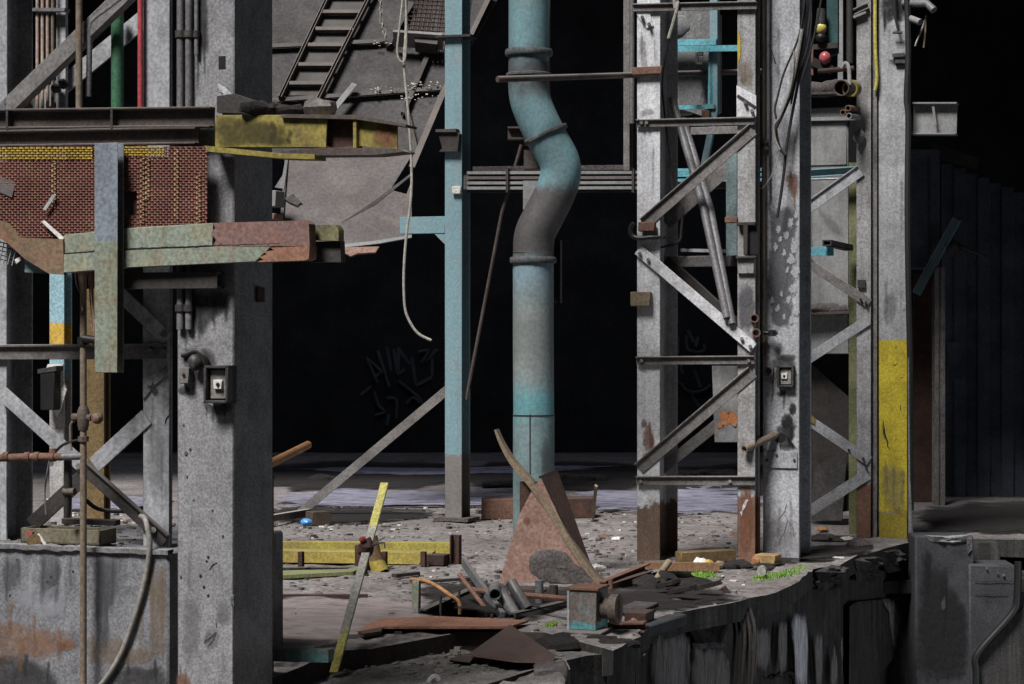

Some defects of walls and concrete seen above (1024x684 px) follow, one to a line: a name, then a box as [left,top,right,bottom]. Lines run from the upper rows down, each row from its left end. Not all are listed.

peeling [768,207,800,326]
corrosion [641,420,654,456]
water stain [0,655,56,684]
water stain [116,653,164,684]